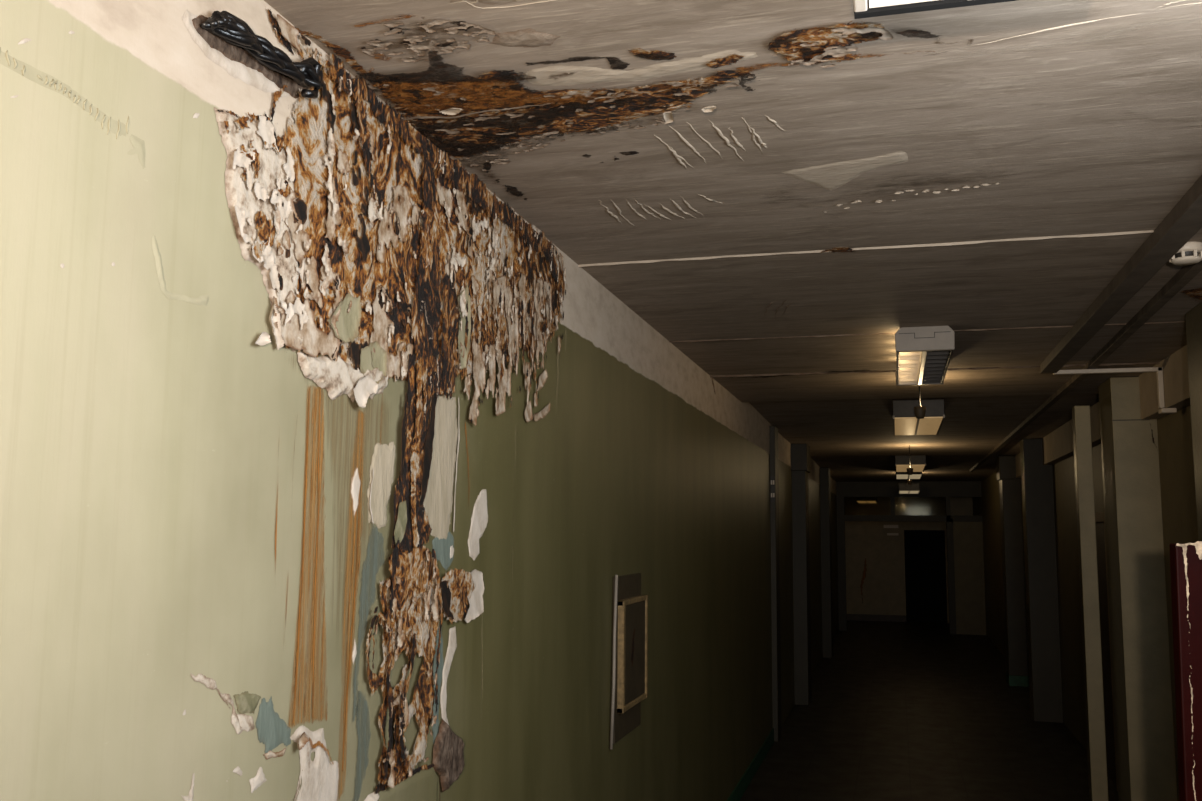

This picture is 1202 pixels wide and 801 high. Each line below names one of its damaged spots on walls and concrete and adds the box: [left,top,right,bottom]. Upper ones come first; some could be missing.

peeling [355,15,561,62]
spalling [524,21,942,86]
peeling [214,107,388,408]
spalling [351,272,566,794]
corrosion [286,387,364,798]
peeling [190,673,261,735]
peeling [233,725,339,801]